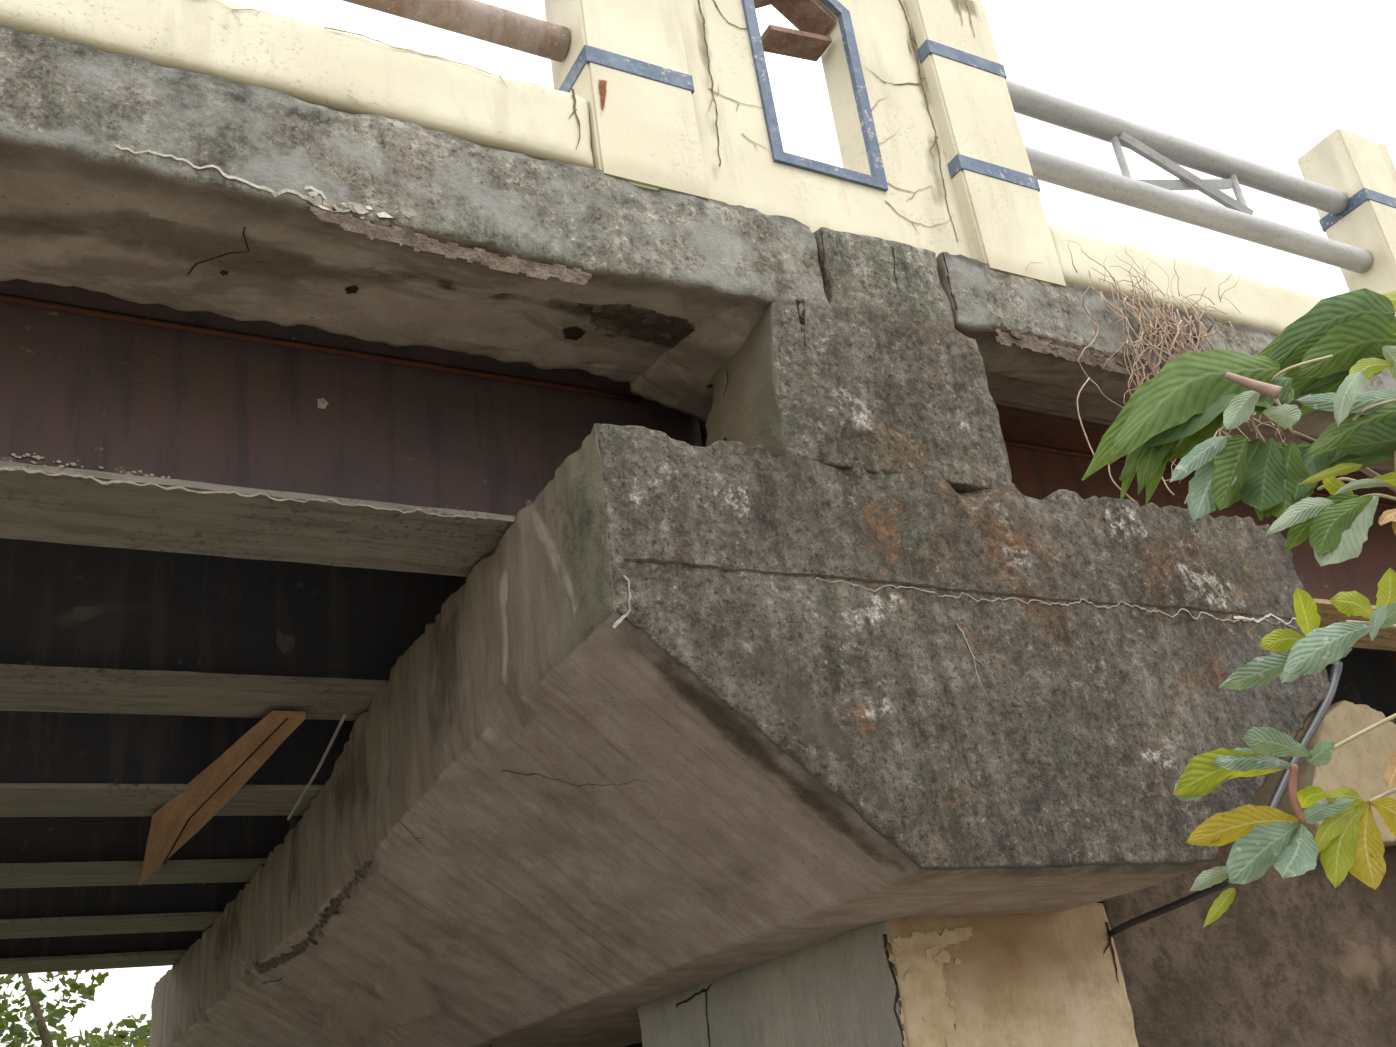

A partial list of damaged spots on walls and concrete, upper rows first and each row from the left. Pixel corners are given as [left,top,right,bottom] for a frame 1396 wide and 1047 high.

leakage [953,0,975,37]
crack [698,0,767,167]
leakage [115,144,351,214]
crack [865,0,958,310]
spalling [306,192,592,285]
leakage [552,302,592,316]
spalling [562,303,695,347]
leakage [622,317,695,348]
crack [624,558,1296,699]
crack [676,982,714,1047]
crack [883,934,904,1047]
peeling [884,927,973,1047]